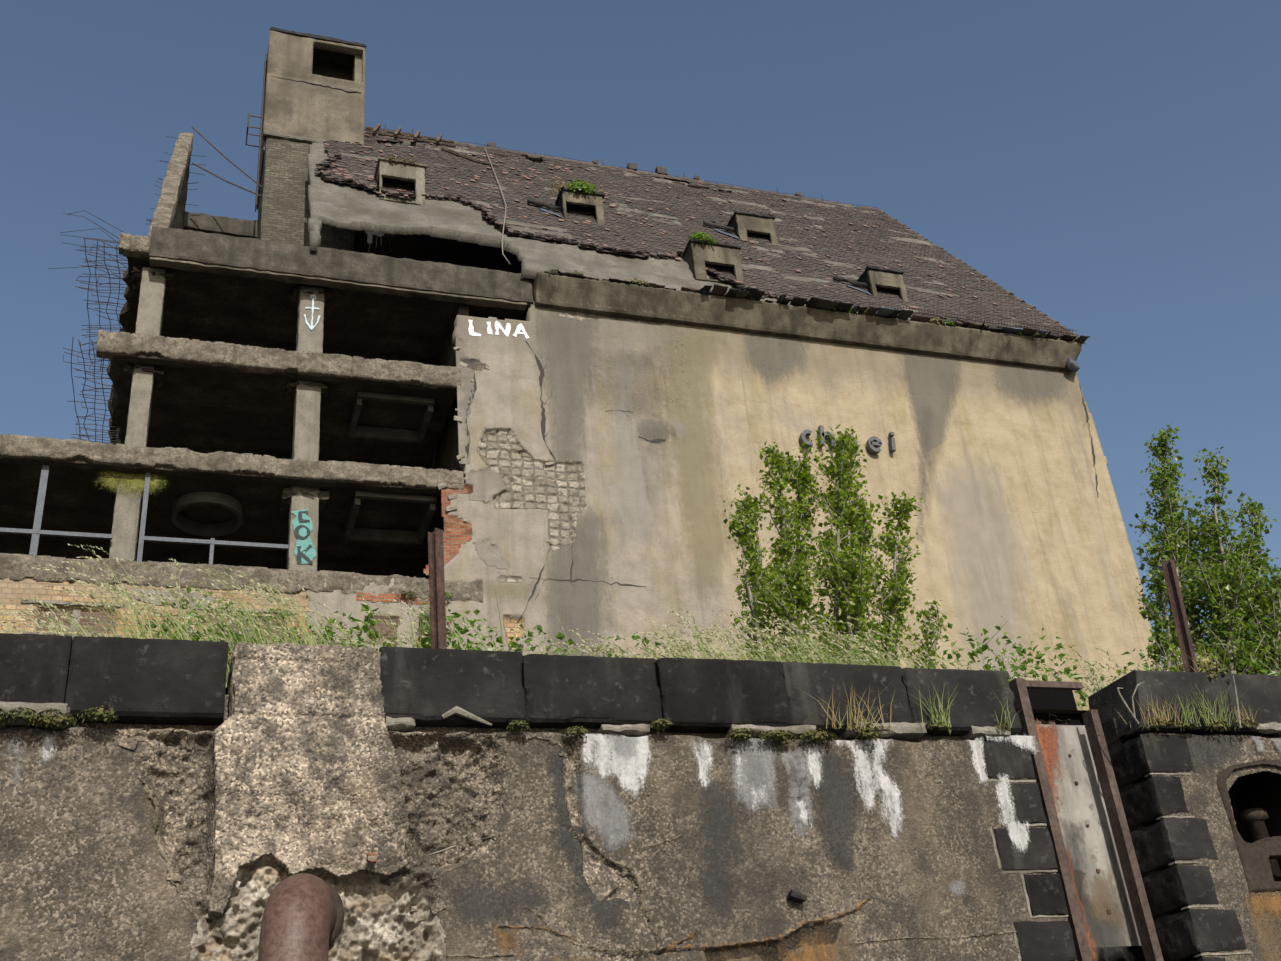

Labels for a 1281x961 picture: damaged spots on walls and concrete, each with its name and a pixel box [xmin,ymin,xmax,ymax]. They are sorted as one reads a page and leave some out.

spalling [424,336,587,582]
crack [526,341,556,460]
peeling [132,588,217,633]
spalling [104,724,289,961]
spalling [310,731,583,961]
crack [429,823,1016,961]
damp [693,738,775,915]
damp [805,738,903,867]
rust [1036,725,1061,808]
damp [1186,737,1281,768]